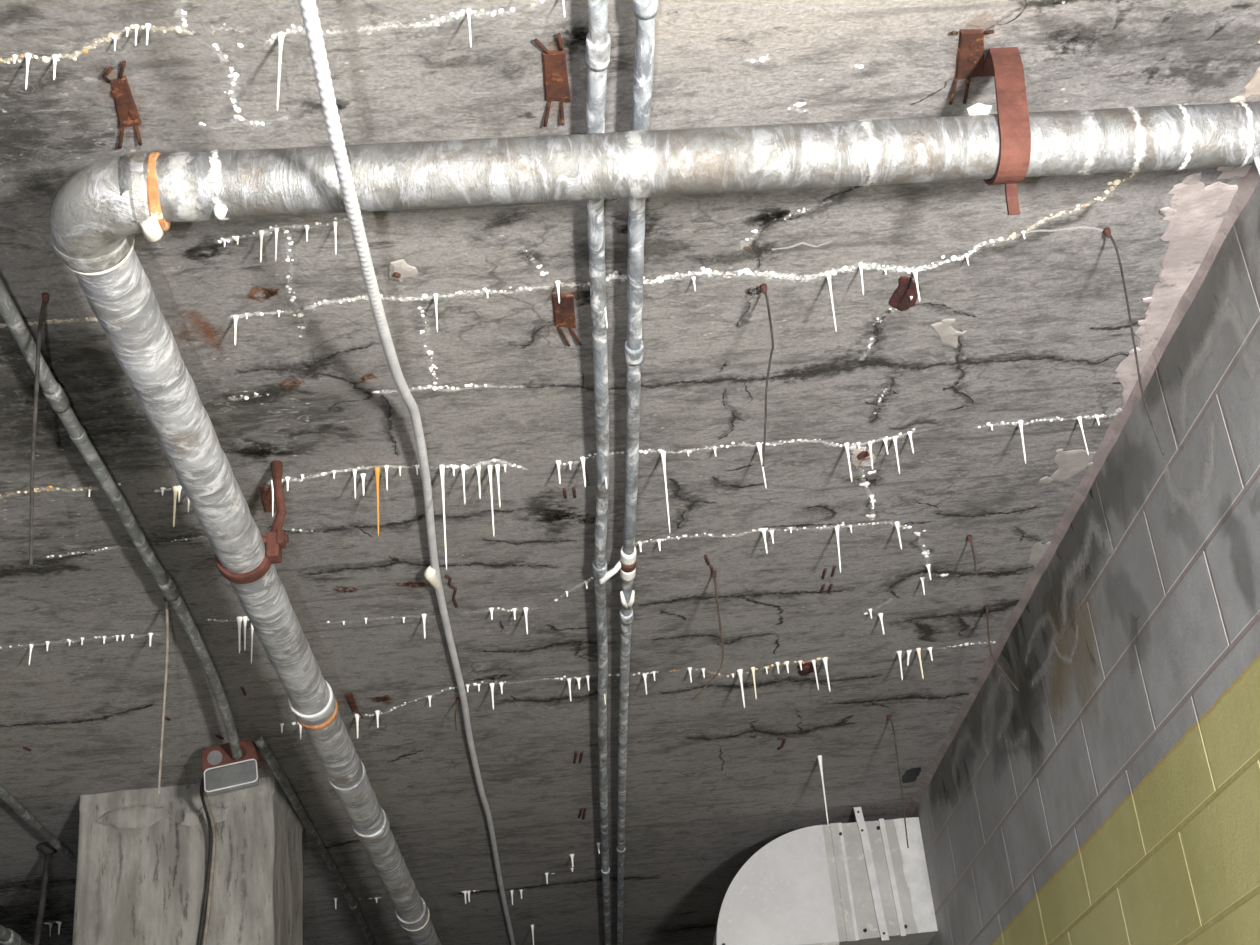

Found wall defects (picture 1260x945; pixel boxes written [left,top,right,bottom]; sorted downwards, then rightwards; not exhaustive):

peeling [1182,166,1235,185]
corrosion [247,286,279,302]
crack [245,345,398,455]
leakage [186,217,590,391]
crack [526,302,1138,439]
leakage [643,171,1141,329]
crack [269,509,573,575]
leakage [435,459,527,570]
leakage [635,420,949,595]
crack [888,502,1043,640]
leakage [673,657,830,708]
crack [640,590,969,771]